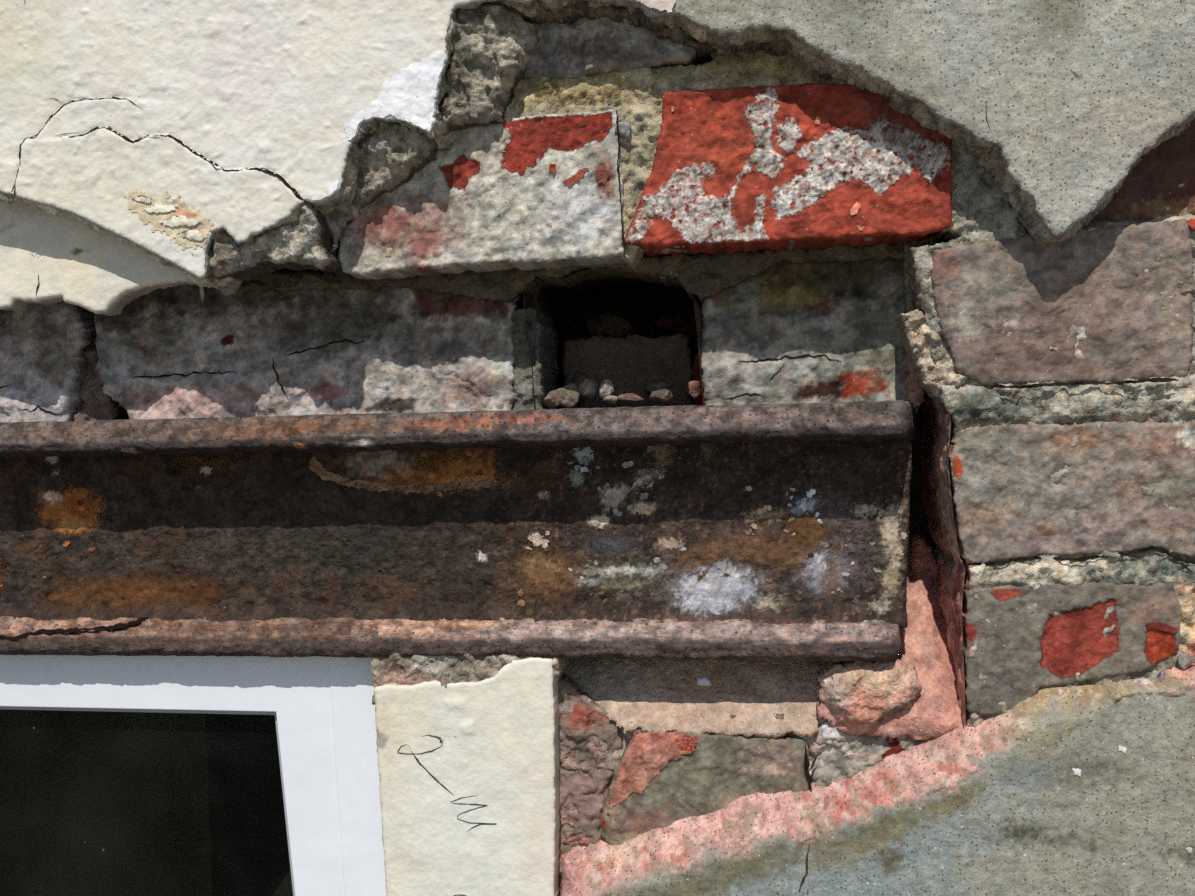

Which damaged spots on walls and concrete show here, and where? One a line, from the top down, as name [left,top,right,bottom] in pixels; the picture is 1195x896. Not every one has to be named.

crack [5,96,308,204]
spalling [124,0,792,282]
peeling [628,88,950,243]
spalling [546,268,705,406]
rust [34,485,104,553]
rust [37,569,228,612]
rust [507,536,586,616]
rust [675,511,846,595]
spalling [1041,600,1120,678]
spalling [1144,622,1178,665]
spalling [601,731,698,829]
spalling [882,737,903,761]